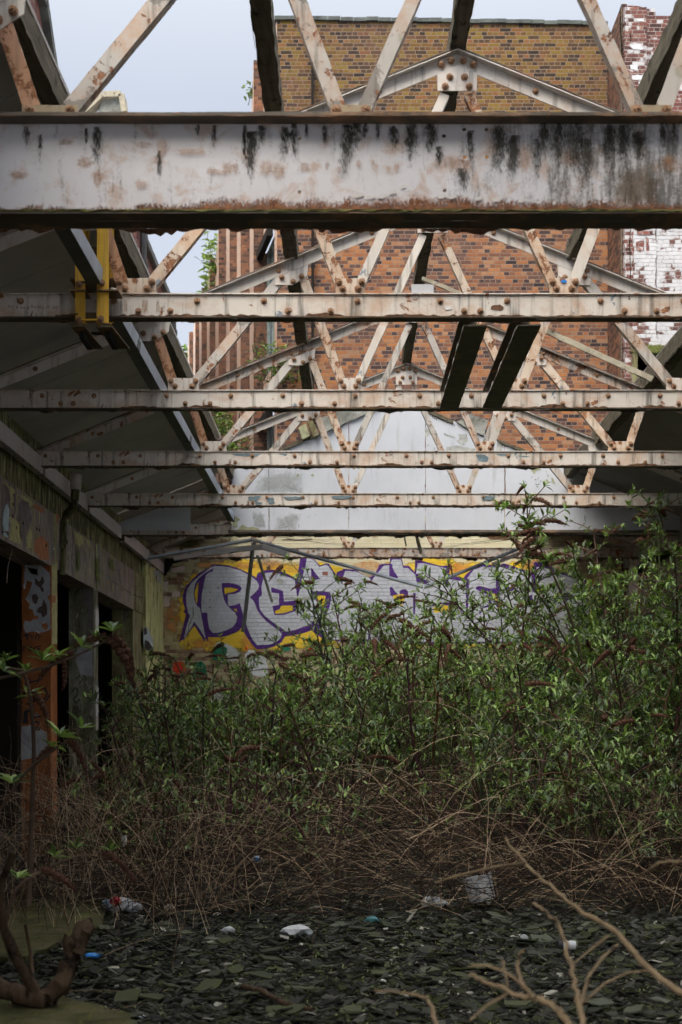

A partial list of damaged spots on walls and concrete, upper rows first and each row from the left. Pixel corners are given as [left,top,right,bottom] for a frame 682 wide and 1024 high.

damp [85,127,103,163]
damp [242,125,266,179]
damp [280,124,308,159]
damp [322,123,443,174]
damp [458,130,474,188]
damp [490,125,520,181]
damp [533,123,658,204]
corrosion [134,195,682,210]
peeling [636,231,653,253]
peeling [2,481,59,644]